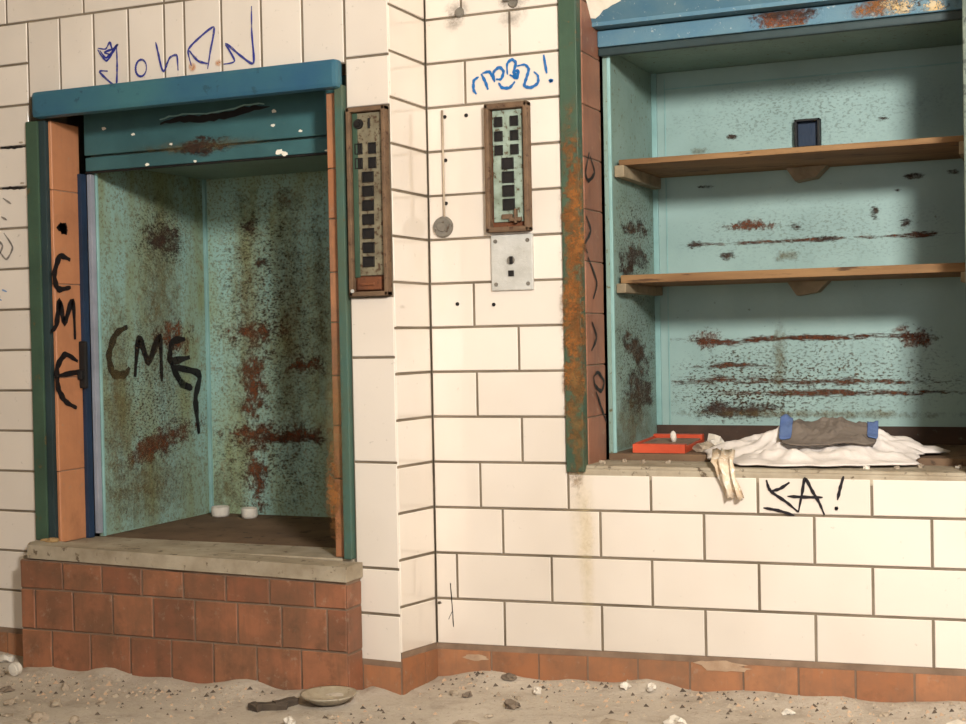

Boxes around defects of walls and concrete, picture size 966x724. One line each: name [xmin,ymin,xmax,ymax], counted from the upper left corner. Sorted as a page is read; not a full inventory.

peeling [586,0,621,19]
rust [753,9,815,28]
rust [856,0,946,16]
rust [175,136,227,156]
rust [688,219,844,260]
rust [884,219,936,238]
rust [561,138,586,453]
rust [109,214,197,499]
rust [222,218,340,533]
rust [674,326,949,418]